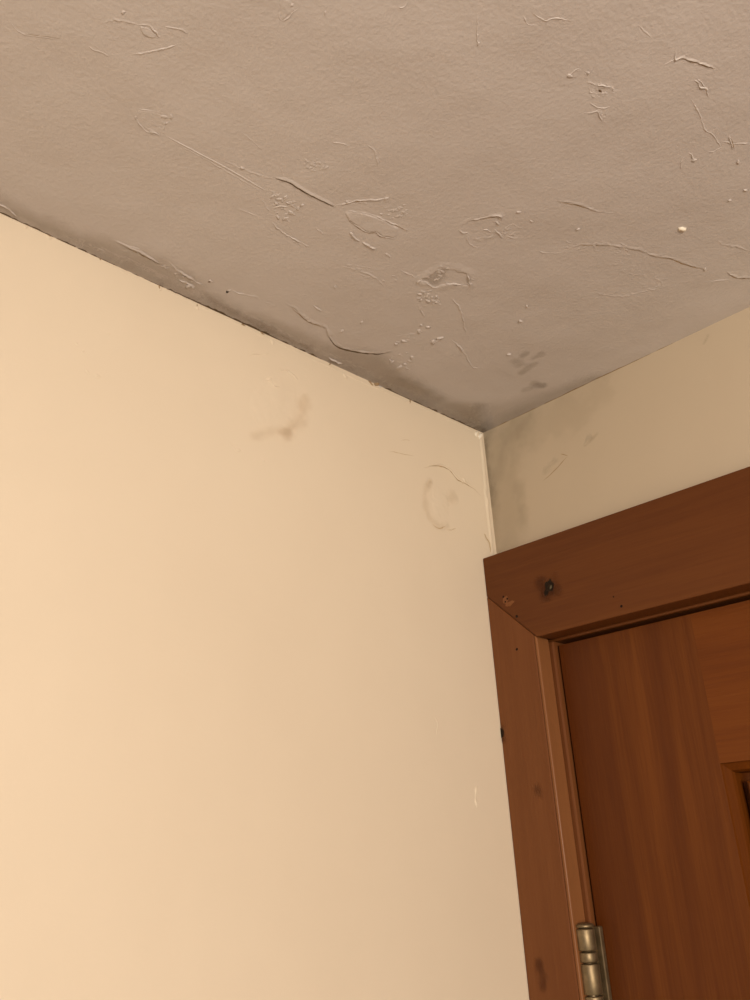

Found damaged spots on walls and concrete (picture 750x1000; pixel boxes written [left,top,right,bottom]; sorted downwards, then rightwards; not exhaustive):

crack [275,166,389,206]
crack [0,204,393,365]
crack [539,240,750,287]
crack [368,346,666,430]